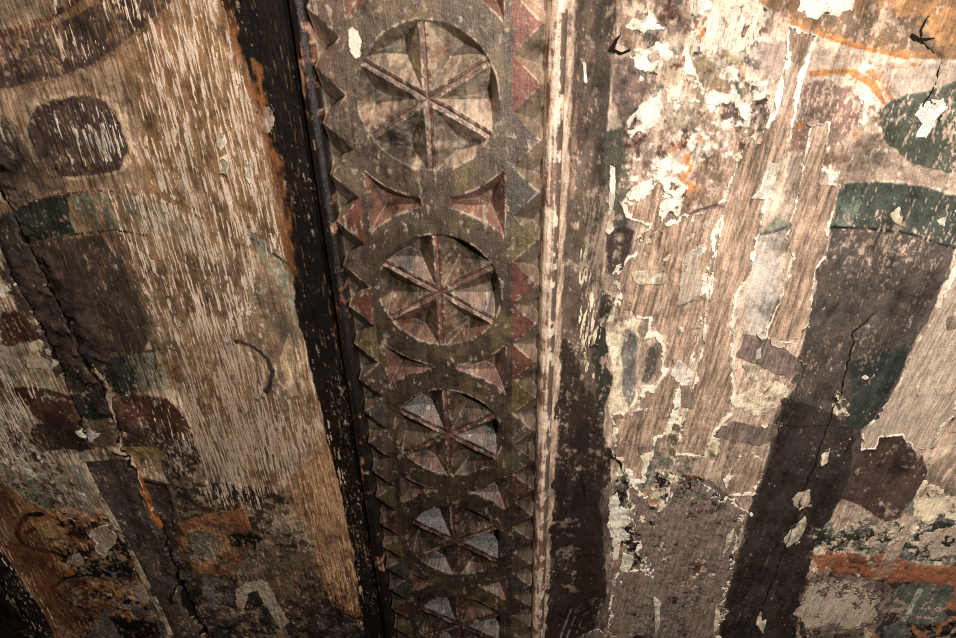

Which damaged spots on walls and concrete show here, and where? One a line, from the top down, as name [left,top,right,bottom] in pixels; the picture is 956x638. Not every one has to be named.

peeling [797,0,855,20]
crack [910,16,943,107]
peeling [890,207,906,230]
peeling [0,339,59,473]
crack [18,229,208,635]
peeling [578,240,602,379]
peeling [582,0,841,638]
crack [750,313,875,638]
peeling [832,391,850,417]
peeling [861,269,956,451]
peeling [793,480,956,638]